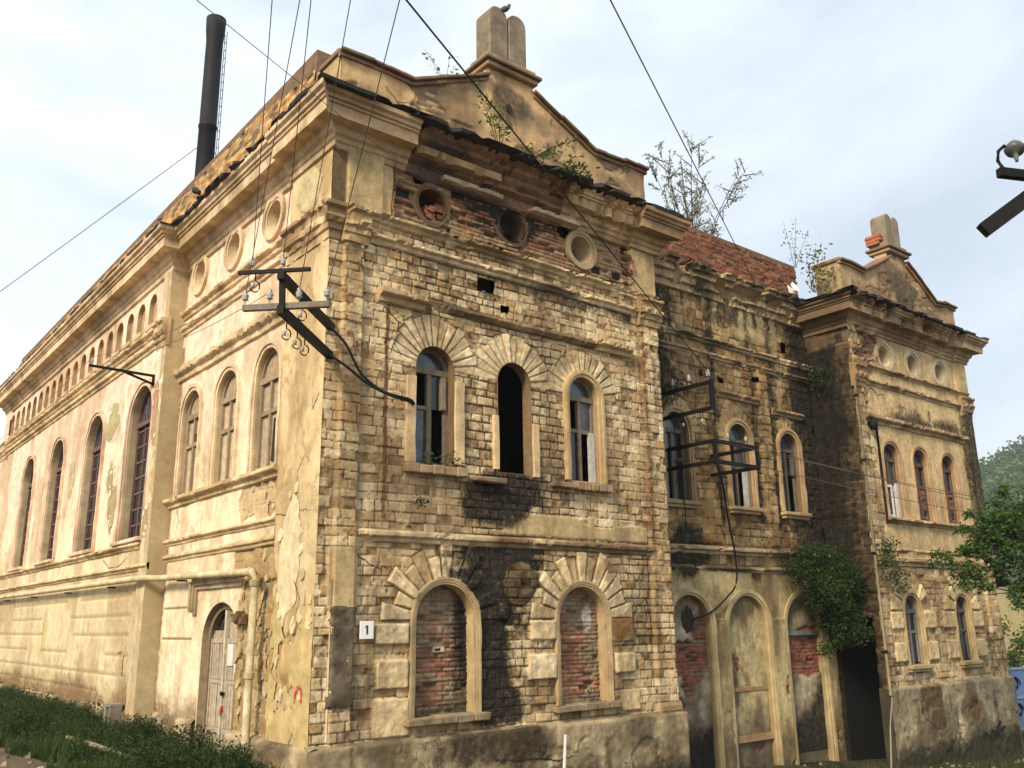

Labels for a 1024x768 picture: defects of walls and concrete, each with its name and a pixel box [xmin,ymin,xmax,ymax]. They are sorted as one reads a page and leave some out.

flaking render [391,159,635,289]
flaking render [106,462,117,534]
flaking render [106,403,120,443]
rust [381,304,390,518]
flaking render [233,478,314,749]
damp [436,471,548,768]